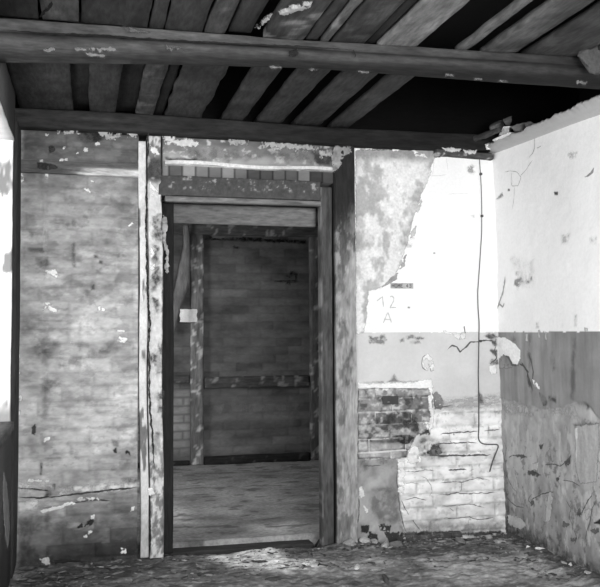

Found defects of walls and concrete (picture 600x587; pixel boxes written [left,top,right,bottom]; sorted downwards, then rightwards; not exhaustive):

flaking render [162,136,199,148]
peeling [148,145,162,196]
peeling [150,219,162,307]
flaking render [331,146,437,334]
crack [448,326,497,364]
flaking render [489,337,521,375]
flaking render [358,388,444,494]
spalling [361,524,501,542]
crack [567,495,596,544]